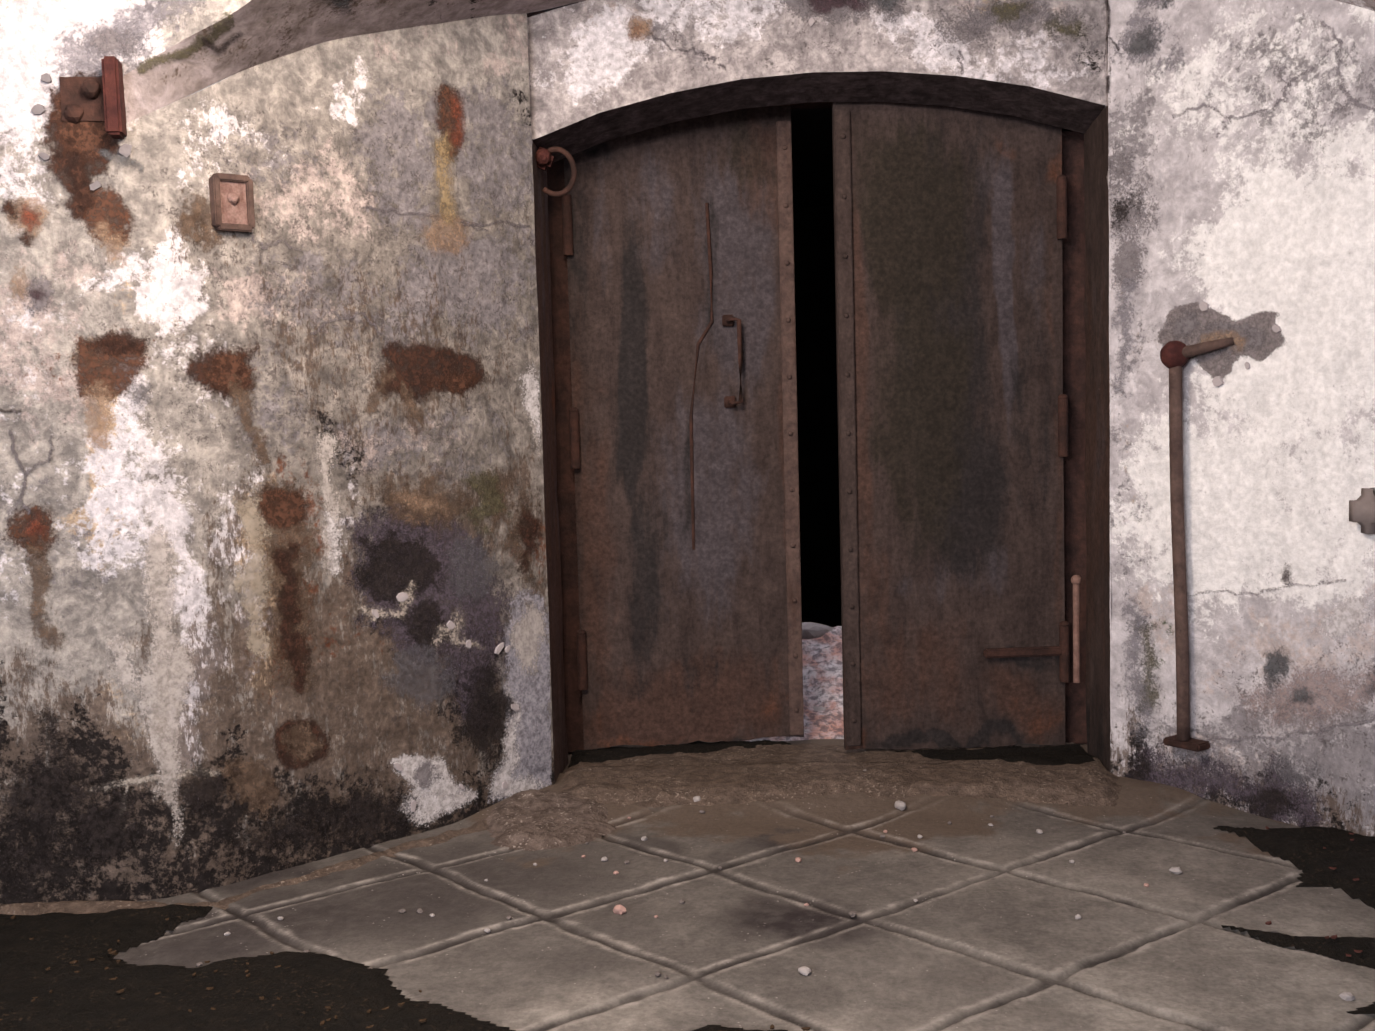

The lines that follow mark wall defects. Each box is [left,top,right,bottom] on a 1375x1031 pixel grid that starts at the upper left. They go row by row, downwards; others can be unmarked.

rust [72,183,132,265]
rust [425,83,469,253]
rust [69,329,149,449]
rust [364,340,485,433]
rust [1,505,64,651]
rust [185,344,320,697]
damp [0,527,420,895]
rust [273,715,332,770]